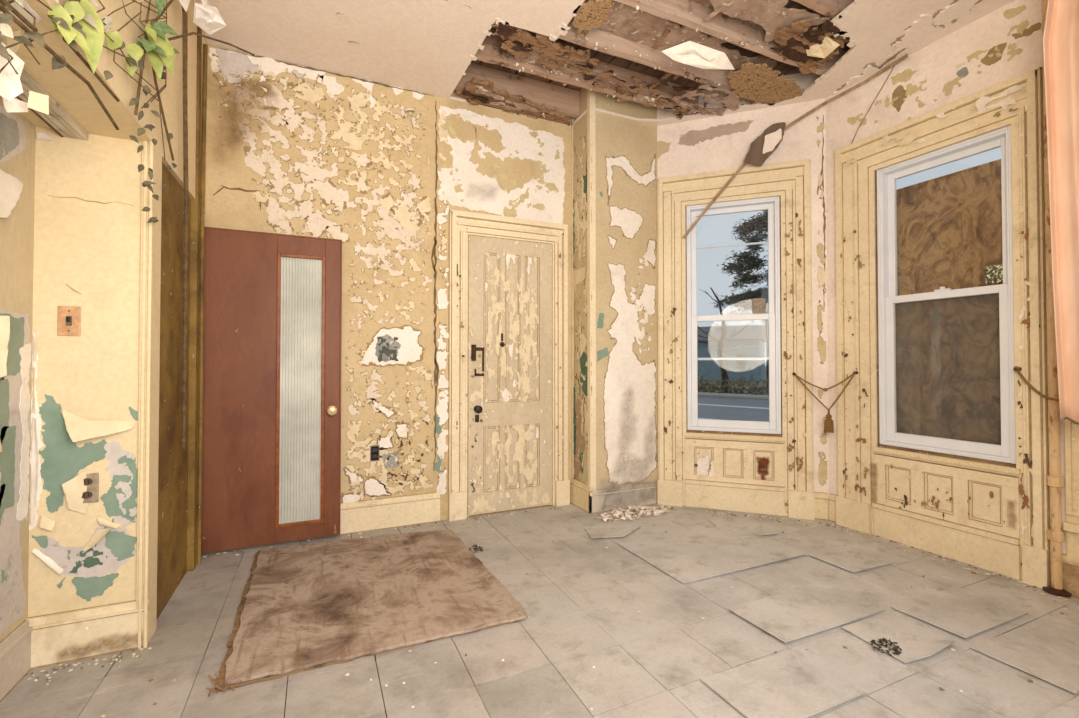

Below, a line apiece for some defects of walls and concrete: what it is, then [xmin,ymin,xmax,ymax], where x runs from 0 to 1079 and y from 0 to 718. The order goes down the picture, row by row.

peeling [462,18,532,75]
peeling [549,13,576,42]
peeling [770,0,864,84]
peeling [847,2,1042,146]
peeling [0,105,53,218]
peeling [208,48,755,514]
spalling [1019,278,1040,331]
spalling [1018,434,1043,541]